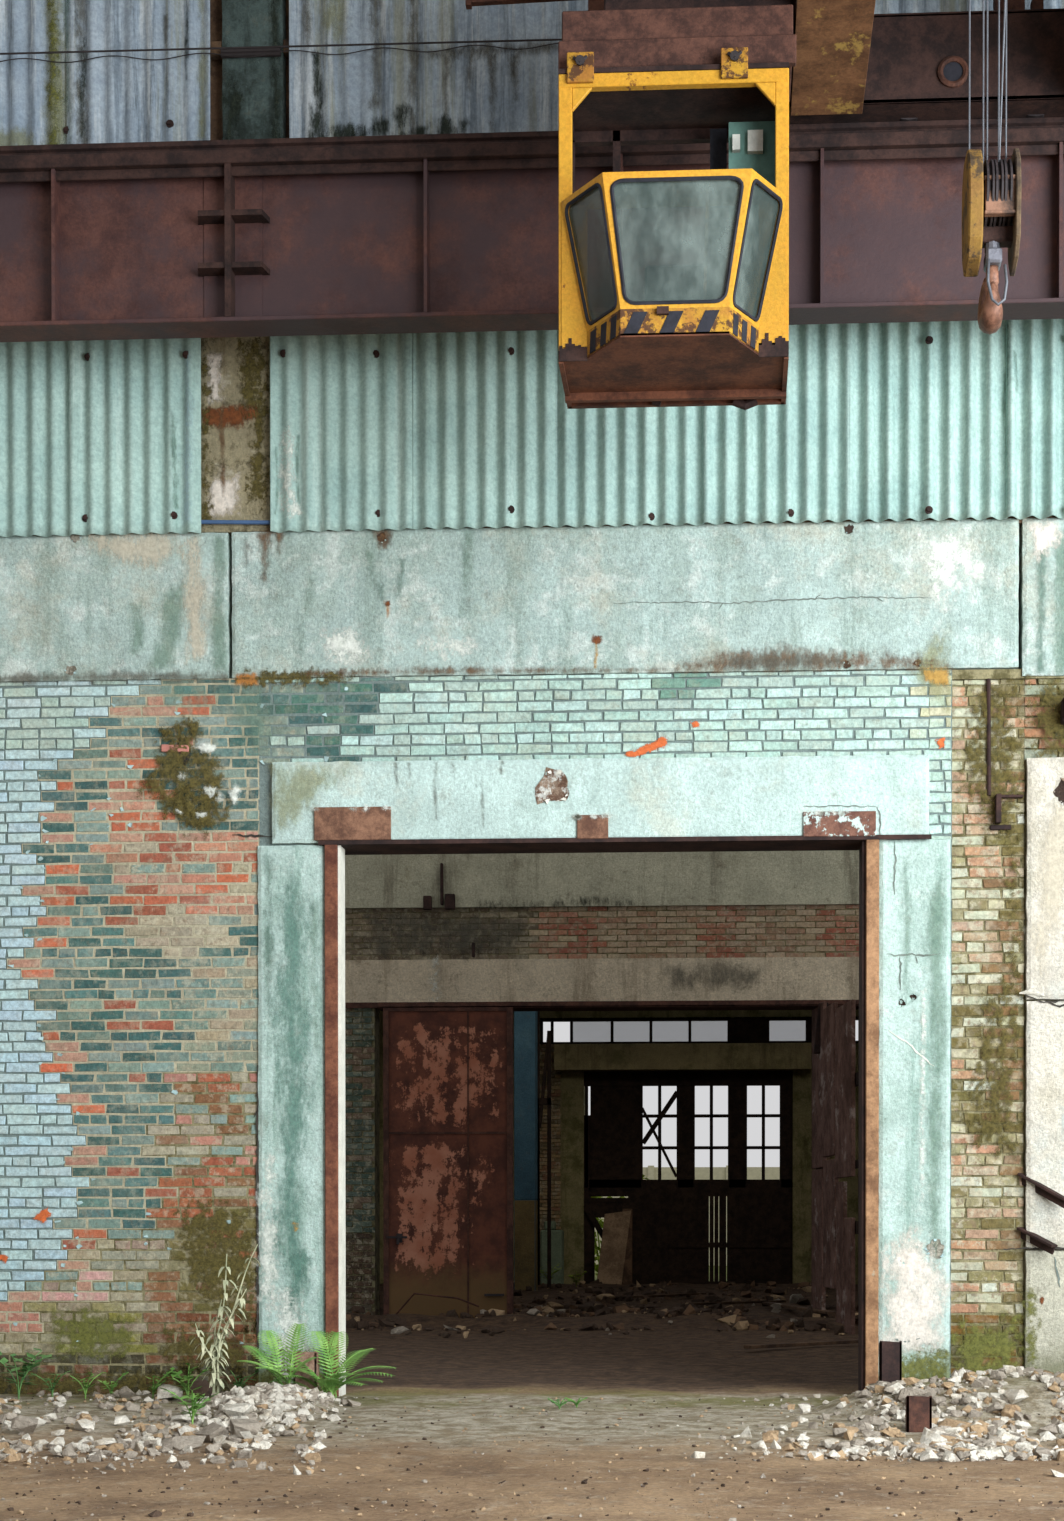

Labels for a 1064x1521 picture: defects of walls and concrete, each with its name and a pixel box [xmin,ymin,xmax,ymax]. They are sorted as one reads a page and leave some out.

water stain [46,0,88,145]
water stain [309,0,553,137]
peeling [71,532,171,566]
peeling [1030,523,1062,558]
water stain [689,649,933,672]
spalling [535,767,611,819]
peeling [0,629,408,1382]